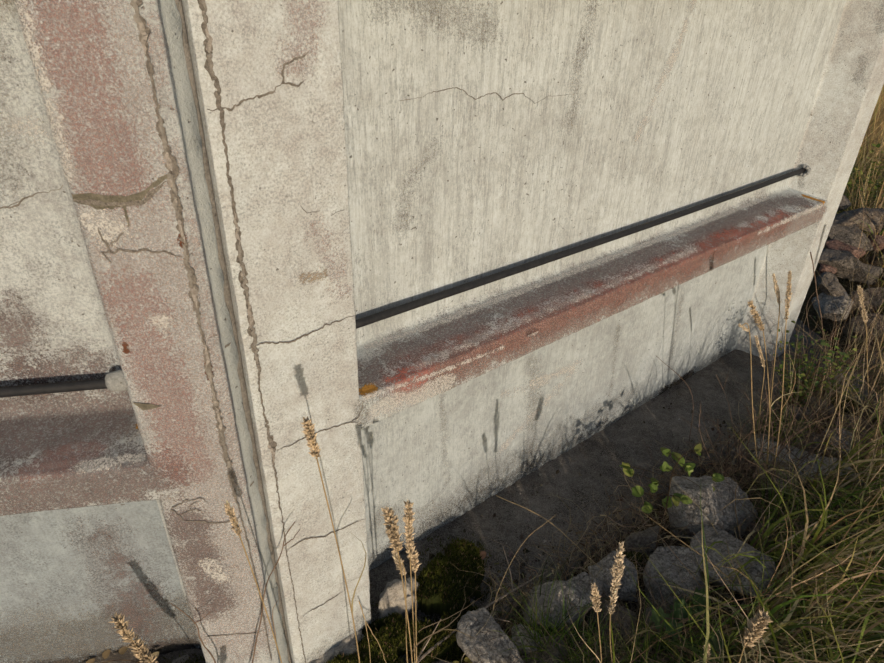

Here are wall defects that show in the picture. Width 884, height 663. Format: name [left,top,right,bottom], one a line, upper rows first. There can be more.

crack [207,52,309,111]
crack [400,87,577,104]
crack [0,185,63,209]
crack [97,228,182,263]
crack [225,316,353,349]
rust [103,269,210,482]
crack [277,401,364,451]
crack [170,497,241,524]
crack [288,519,365,550]